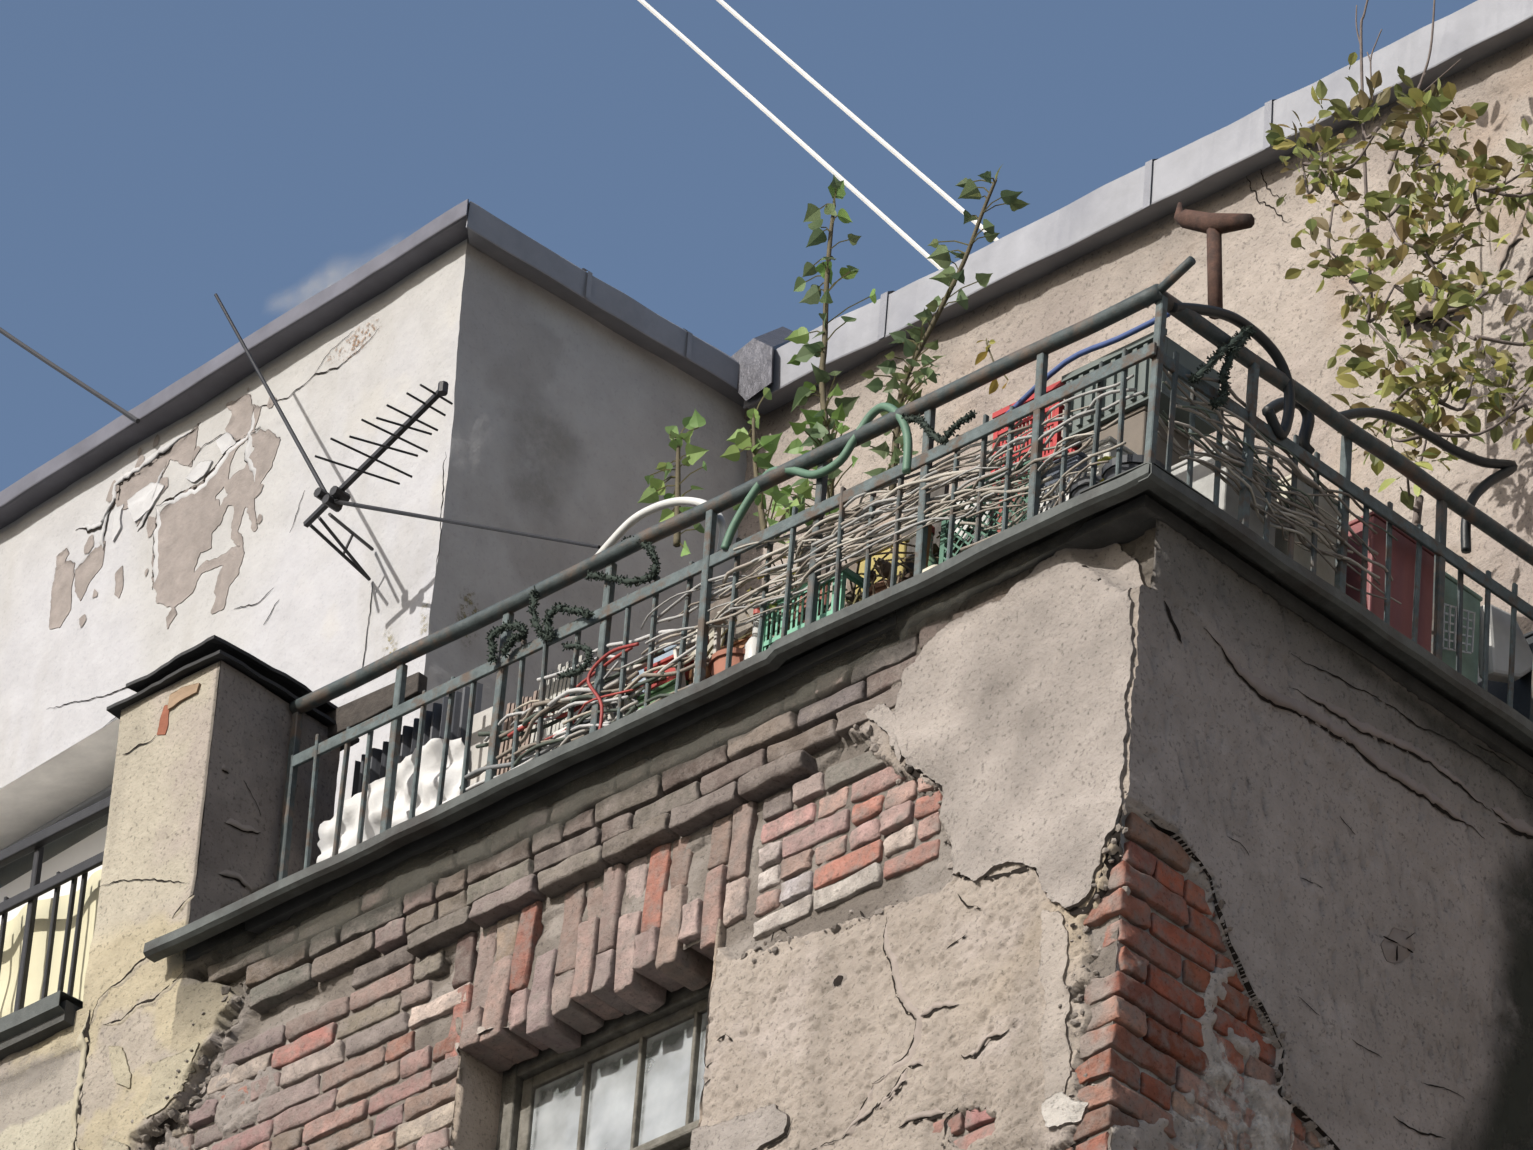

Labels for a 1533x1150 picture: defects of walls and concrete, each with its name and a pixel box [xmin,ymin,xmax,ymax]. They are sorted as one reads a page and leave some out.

peeling [49,387,281,629]
spalling [157,683,201,735]
crack [1164,601,1533,839]
crack [99,870,253,919]
flaking render [736,542,1329,1150]
crack [67,957,184,1150]
crack [152,1083,209,1150]
spalling [104,950,473,1150]
flaking render [690,1104,790,1150]
crack [767,911,986,1150]
crack [961,1029,1009,1059]
damp [1476,860,1533,1150]